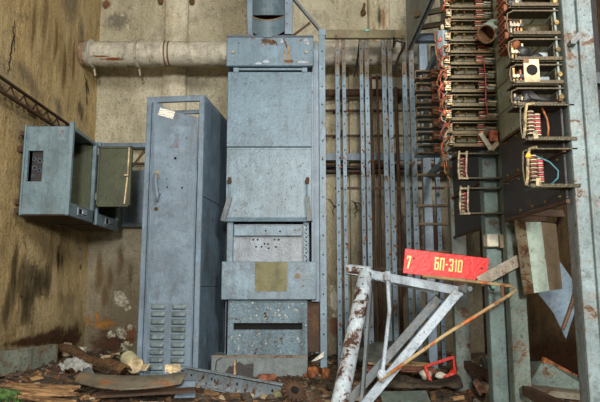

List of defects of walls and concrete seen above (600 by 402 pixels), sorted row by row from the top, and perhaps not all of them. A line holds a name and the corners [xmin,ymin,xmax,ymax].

crack [7,20,15,70]
water stain [4,247,63,323]
water stain [5,325,81,356]
water stain [93,330,134,352]